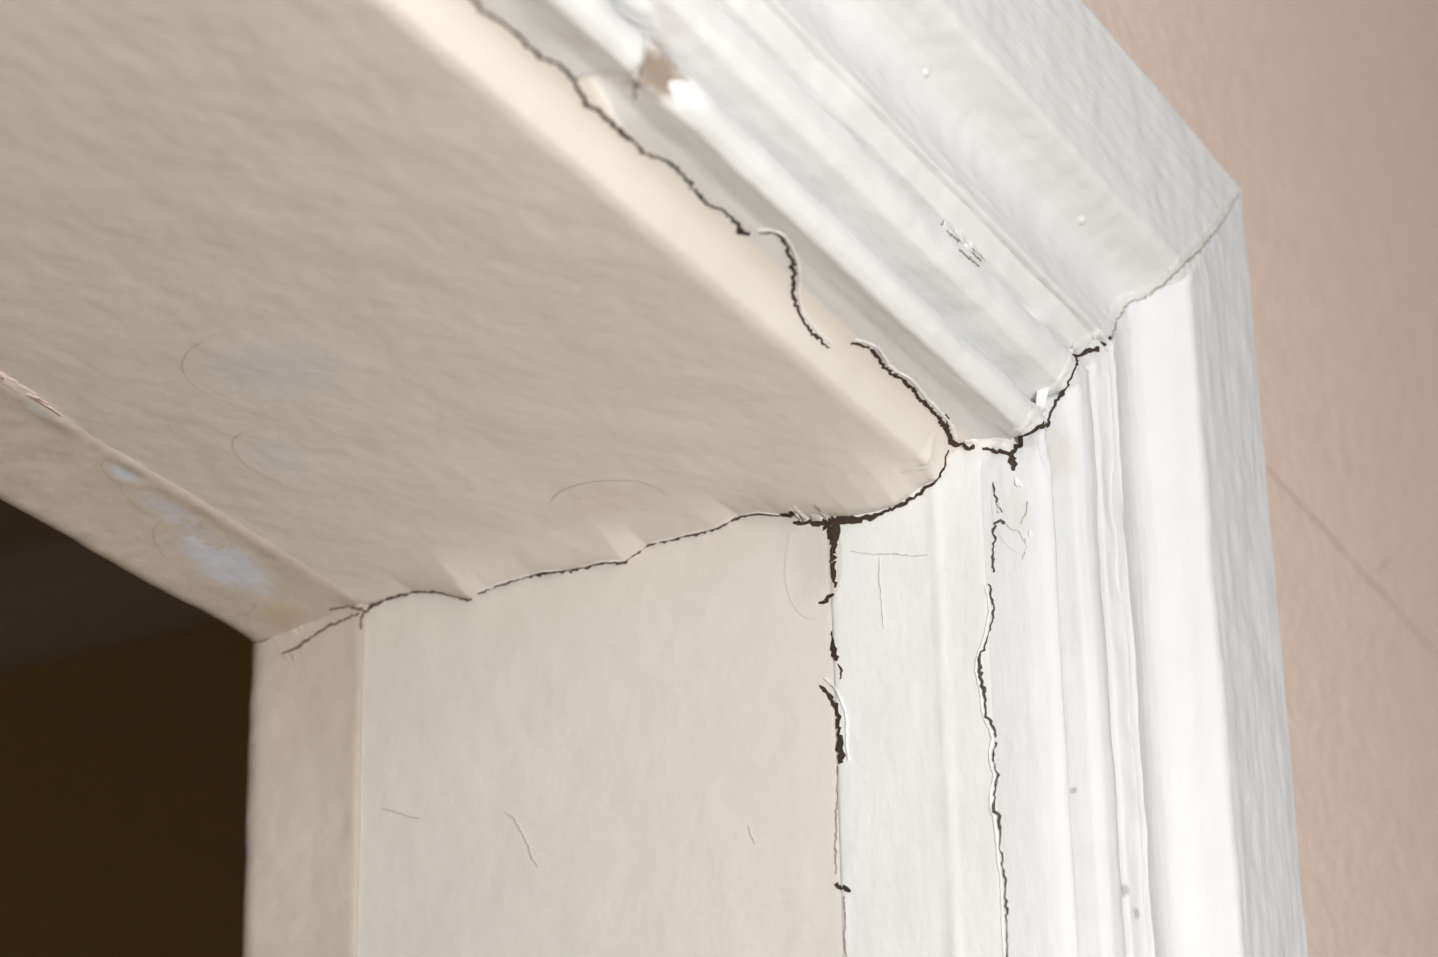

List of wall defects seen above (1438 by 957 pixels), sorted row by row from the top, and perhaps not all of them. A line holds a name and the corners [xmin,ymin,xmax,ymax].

crack [282,0,1239,957]